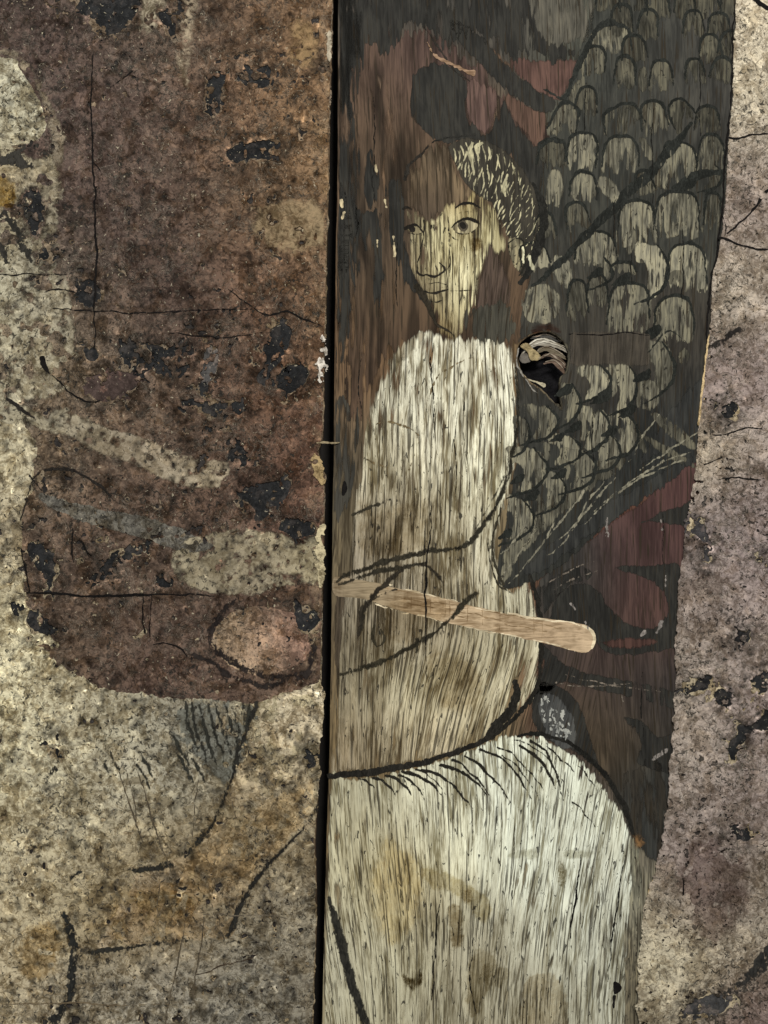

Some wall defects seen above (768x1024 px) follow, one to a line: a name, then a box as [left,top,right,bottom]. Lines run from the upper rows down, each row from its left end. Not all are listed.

peeling [75,0,141,41]
peeling [205,53,282,118]
crack [0,54,320,349]
peeling [226,134,287,167]
crack [680,0,768,345]
peeling [255,318,328,399]
peeling [235,474,326,588]
peeling [675,675,768,761]